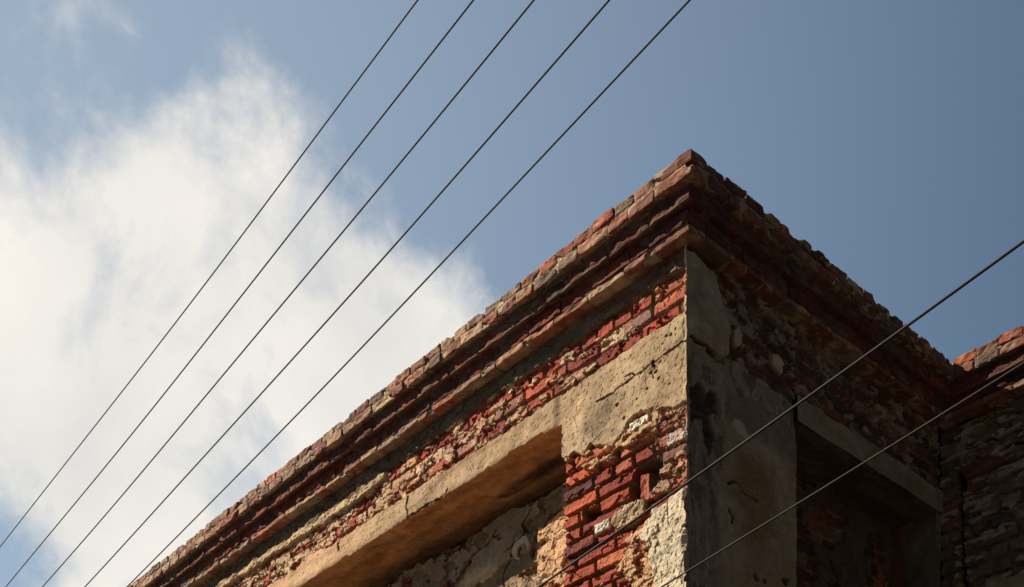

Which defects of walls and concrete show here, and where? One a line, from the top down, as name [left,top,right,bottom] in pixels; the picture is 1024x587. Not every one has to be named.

spalling [223,267,686,587]
spalling [392,383,797,587]
crack [563,333,725,402]